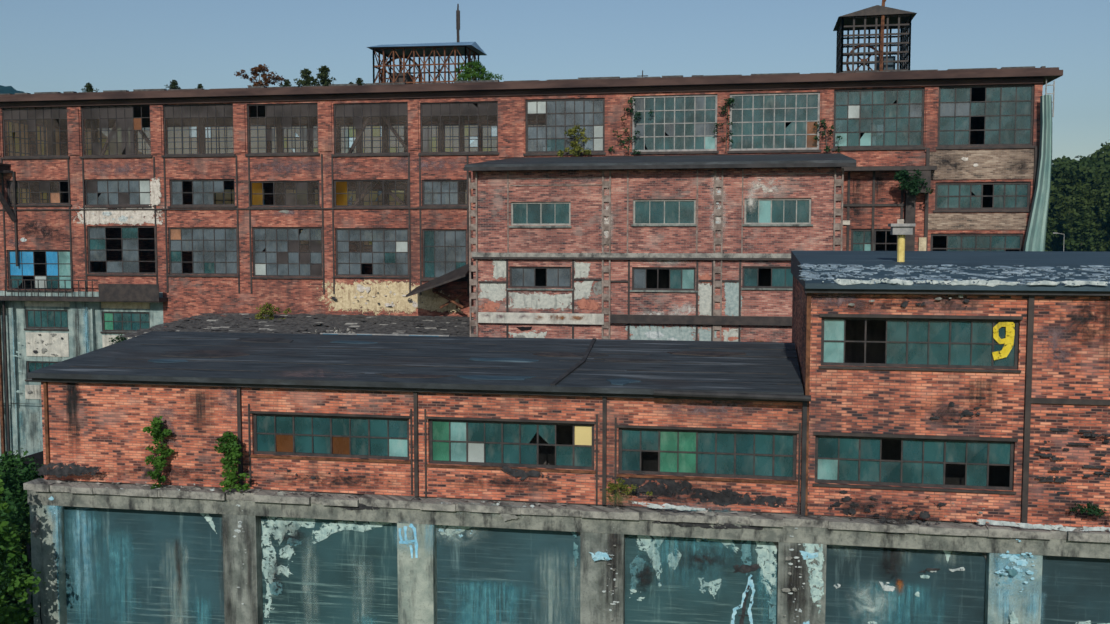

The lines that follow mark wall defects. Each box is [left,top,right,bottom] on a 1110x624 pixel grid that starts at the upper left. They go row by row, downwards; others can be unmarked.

flaking render [310,279,462,316]
flaking render [509,330,547,338]
peeling [478,259,602,312]
flaking render [624,273,742,342]
peeling [798,263,1110,308]
peeling [200,468,392,624]
peeling [436,525,473,538]
spalling [571,474,840,624]